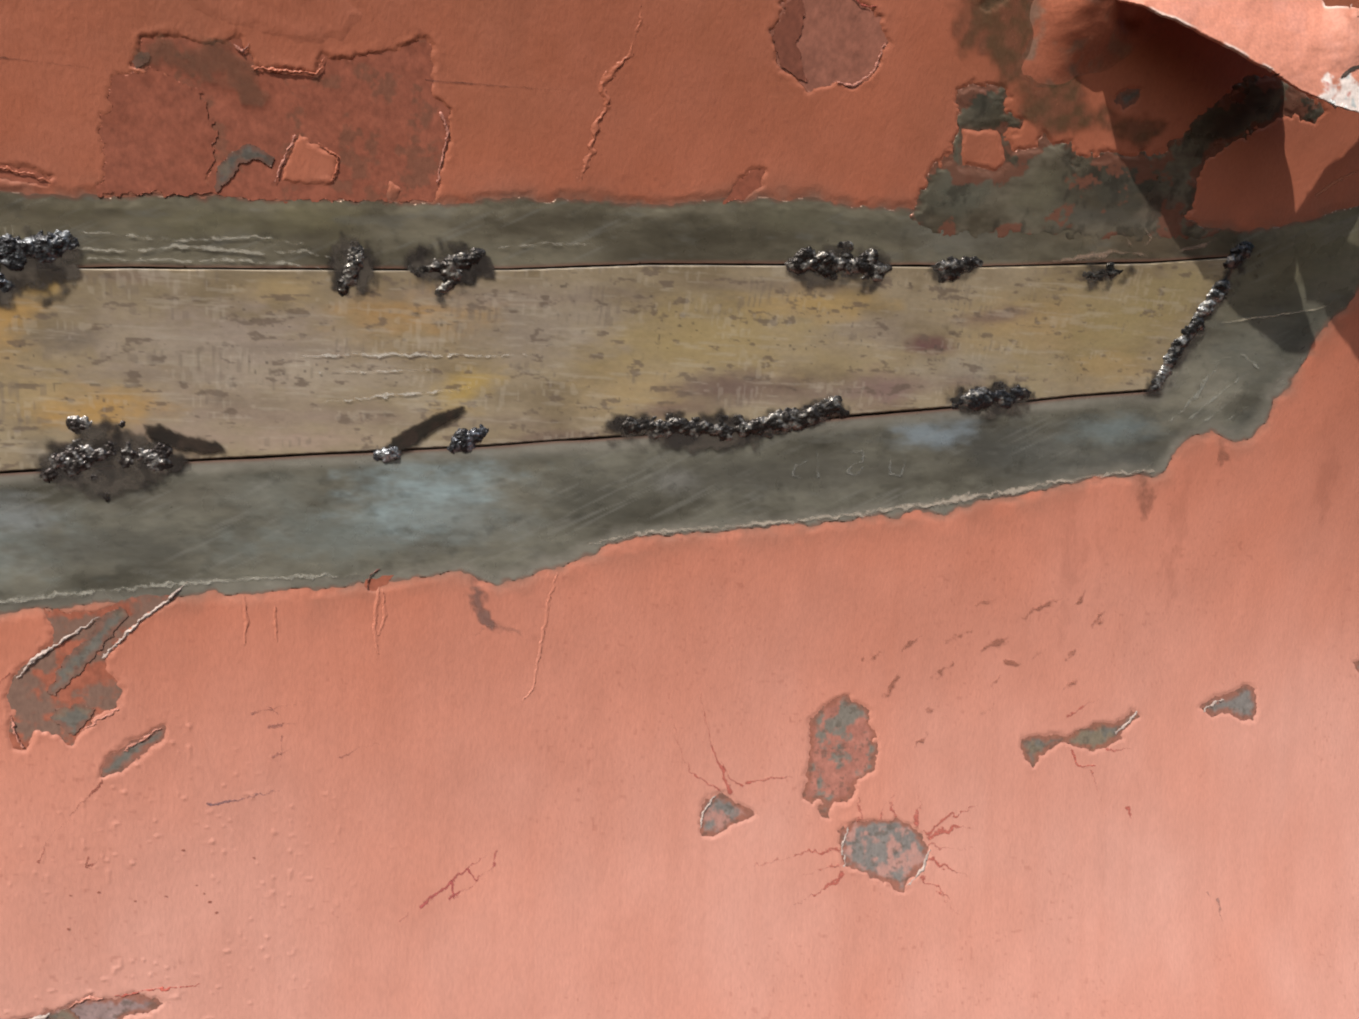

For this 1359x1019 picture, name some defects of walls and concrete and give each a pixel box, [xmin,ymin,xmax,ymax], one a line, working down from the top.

peeling [769,0,888,92]
peeling [96,37,451,203]
crack [577,4,644,184]
peeling [6,582,187,750]
peeling [101,725,166,777]
peeling [699,792,754,836]
crack [795,848,844,896]
peeling [802,695,931,893]
crack [857,806,962,894]
peeling [1020,710,1140,767]
peeling [1200,684,1257,721]
peeling [19,983,200,1019]